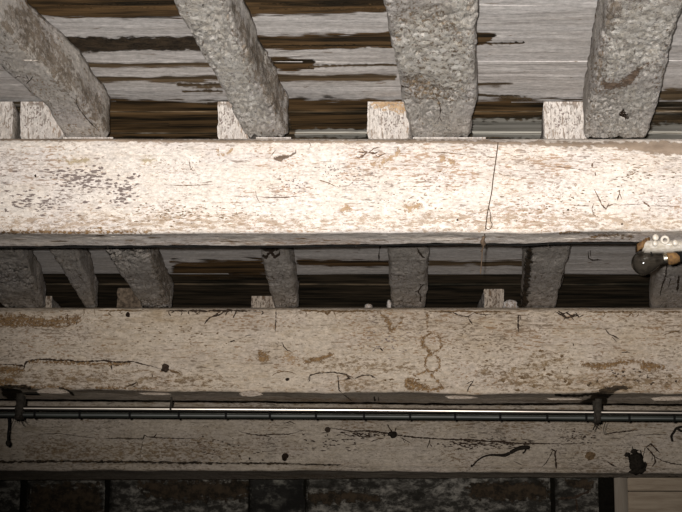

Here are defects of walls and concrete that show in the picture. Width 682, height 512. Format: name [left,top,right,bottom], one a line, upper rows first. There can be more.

crack [168,309,292,352]
crack [3,358,180,377]
crack [308,371,375,401]
crack [332,424,576,469]